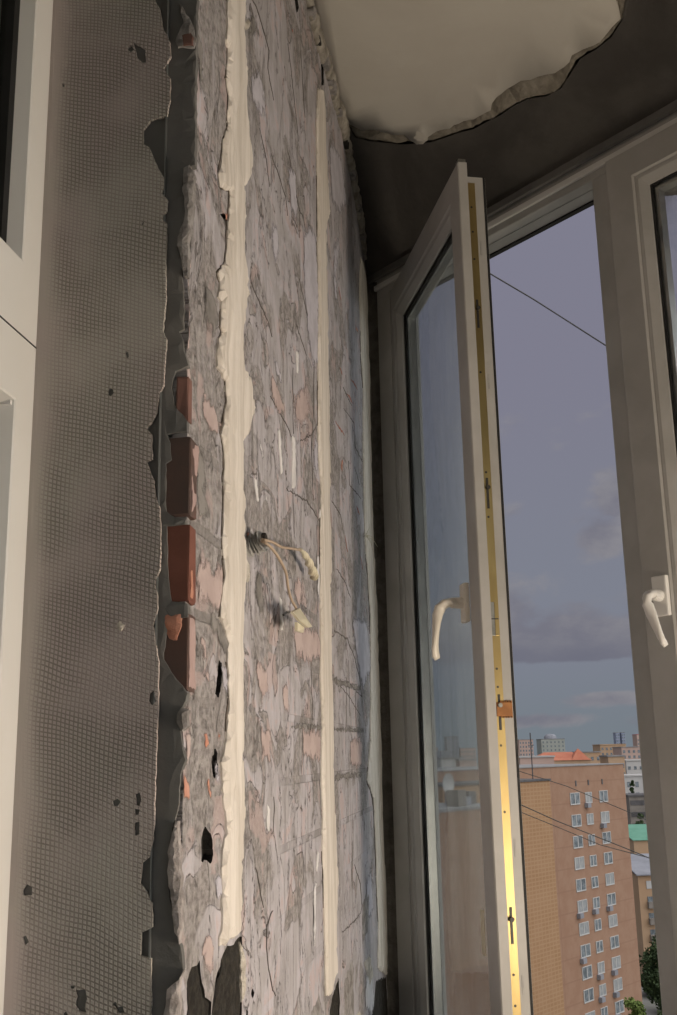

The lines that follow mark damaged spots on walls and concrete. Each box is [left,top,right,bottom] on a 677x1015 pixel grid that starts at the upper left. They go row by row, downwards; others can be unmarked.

flaking render [337,0,625,150]
crack [250,0,317,257]
crack [251,282,272,336]
crack [270,278,363,534]
crack [334,630,362,717]
crack [255,867,276,996]
crack [342,864,362,932]
flaking render [187,937,240,1015]
flaking render [311,960,354,1015]
flaking render [372,978,387,1015]